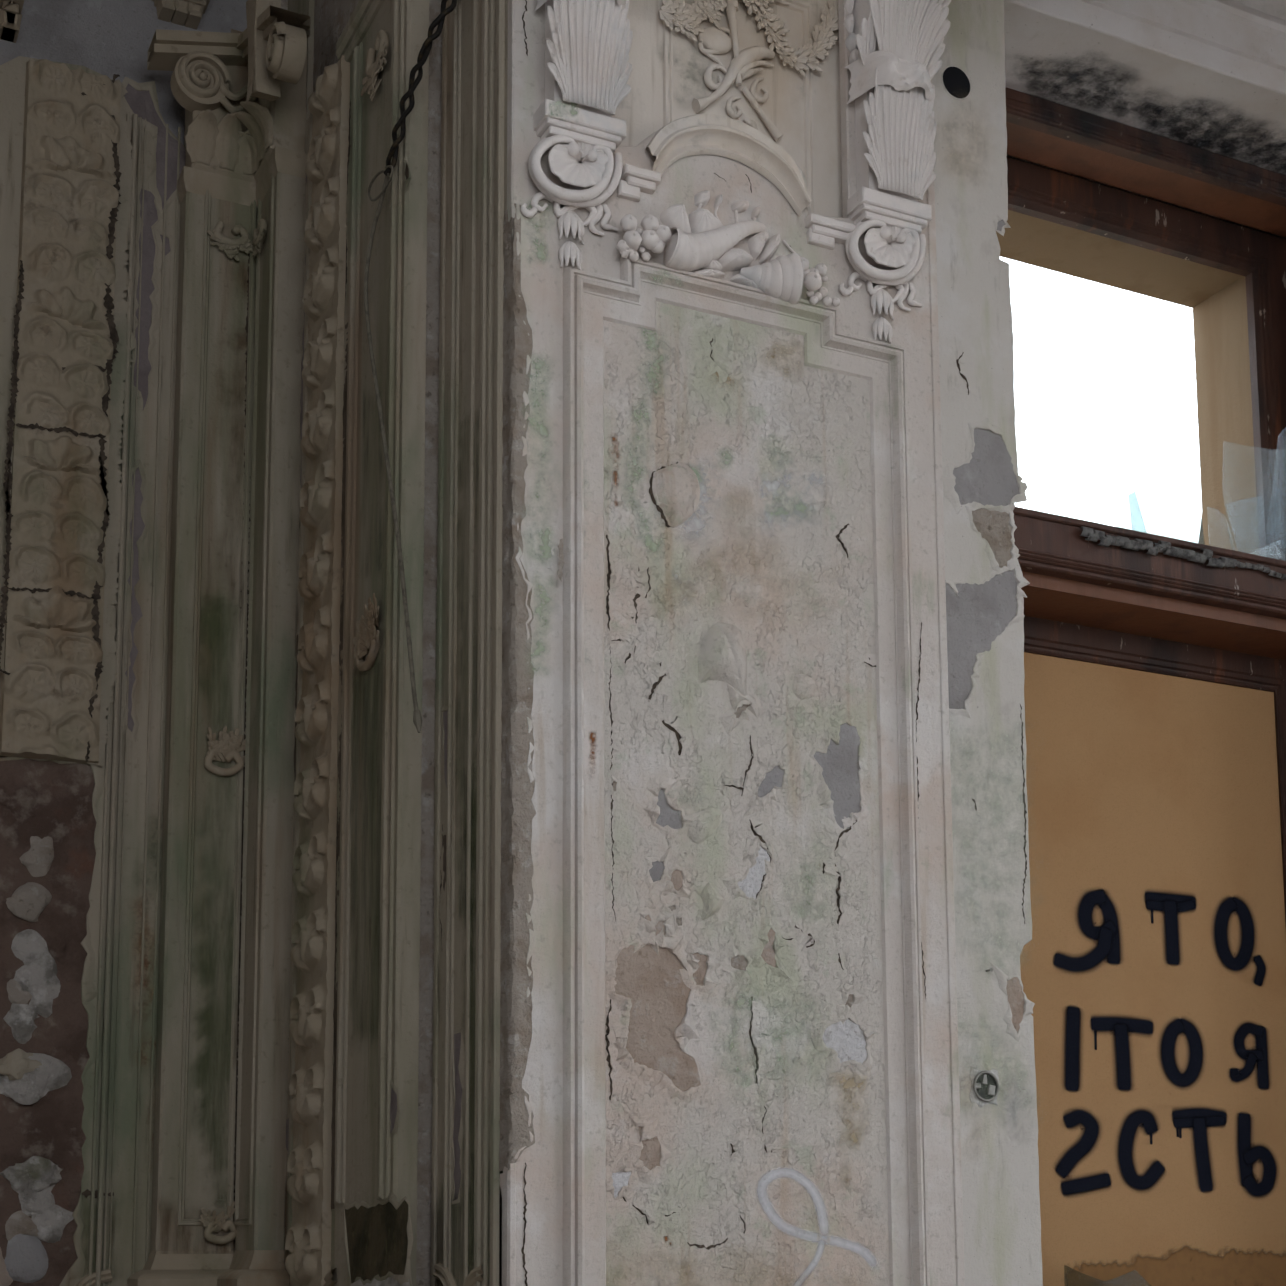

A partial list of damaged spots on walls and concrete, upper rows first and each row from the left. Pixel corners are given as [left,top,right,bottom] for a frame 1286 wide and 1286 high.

crack [0,74,138,766]
spalling [339,314,348,692]
crack [836,523,866,558]
spalling [943,418,1030,719]
spalling [0,756,104,1286]
spalling [331,715,413,1286]
spalling [605,775,793,1103]
crack [604,535,864,1134]
spalling [743,755,790,817]
spalling [809,716,870,831]
spalling [810,989,876,1075]
crack [623,1177,769,1279]